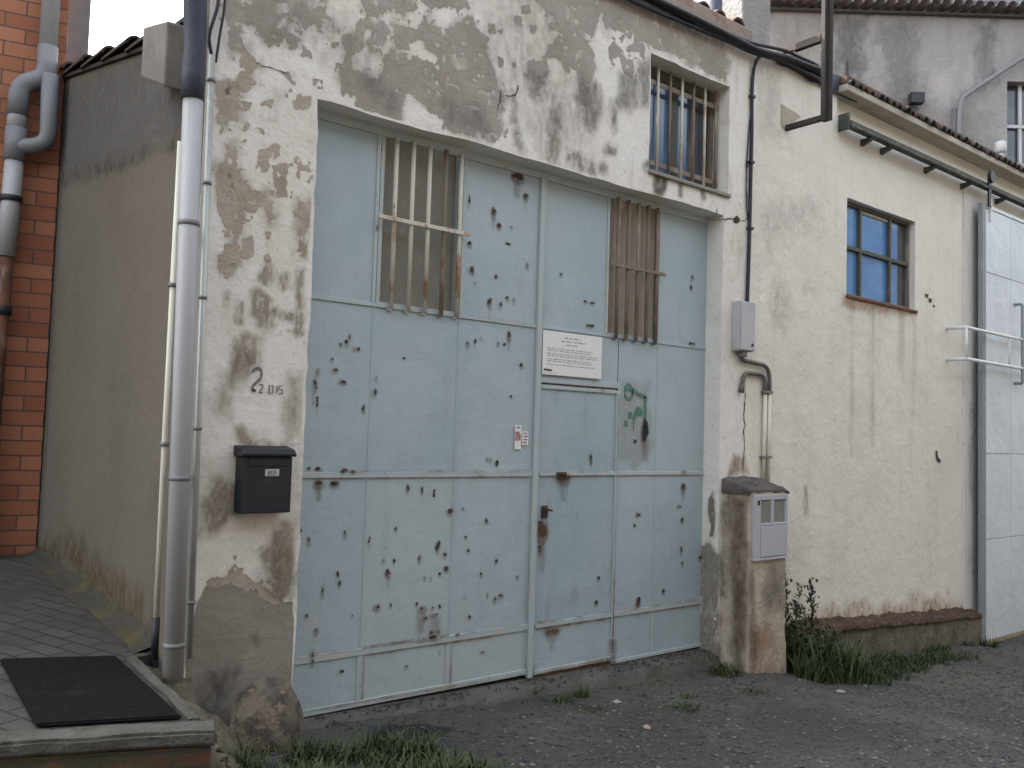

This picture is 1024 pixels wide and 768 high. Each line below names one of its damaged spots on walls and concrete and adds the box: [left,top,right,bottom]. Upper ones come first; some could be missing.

peeling [212,0,731,367]
corrosion [654,176,667,196]
corrosion [538,521,547,552]
peeling [185,532,294,726]
corrosion [370,630,459,647]
corrosion [536,600,614,676]